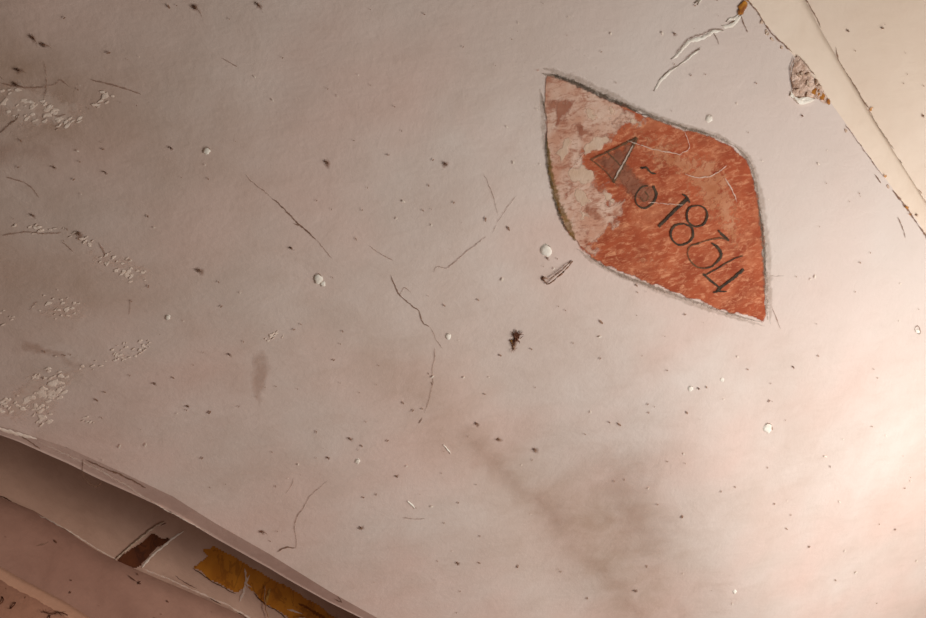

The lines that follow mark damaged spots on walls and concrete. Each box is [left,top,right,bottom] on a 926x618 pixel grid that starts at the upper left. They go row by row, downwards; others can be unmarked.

crack [654,0,792,91]
flaking render [789,55,828,105]
crack [836,50,902,163]
crack [844,126,926,236]
peeling [0,367,72,427]
flaking render [0,428,339,618]